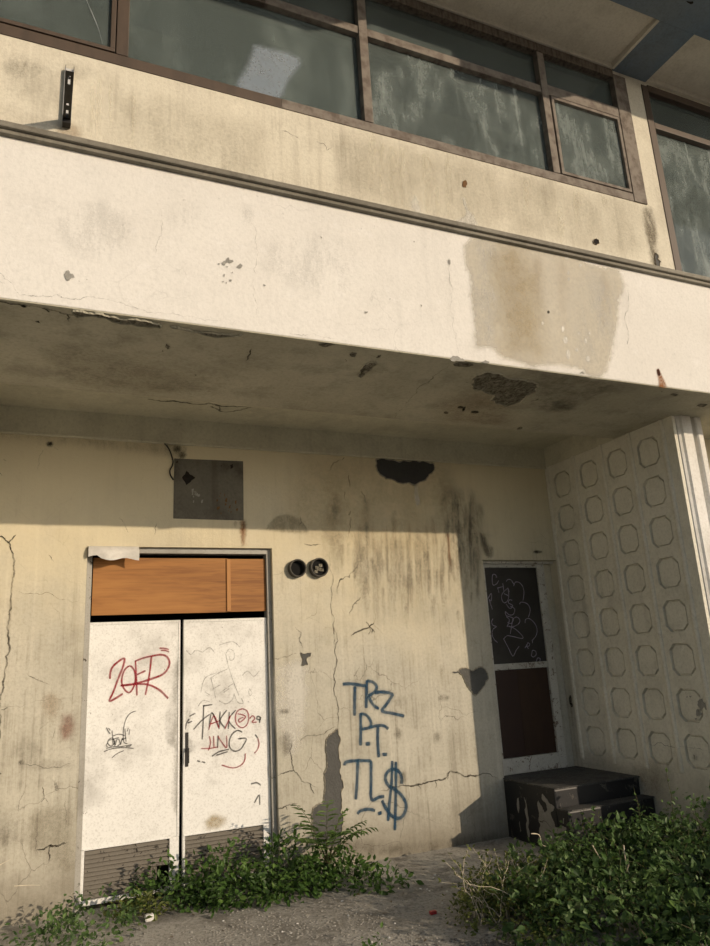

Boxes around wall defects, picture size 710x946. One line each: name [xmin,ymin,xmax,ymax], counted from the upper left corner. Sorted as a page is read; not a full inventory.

water stain [466,239,623,376]
crack [149,399,253,412]
spalling [450,356,541,408]
flaking render [375,458,435,486]
crack [0,592,64,735]
crack [381,772,493,791]
peeling [517,794,566,850]